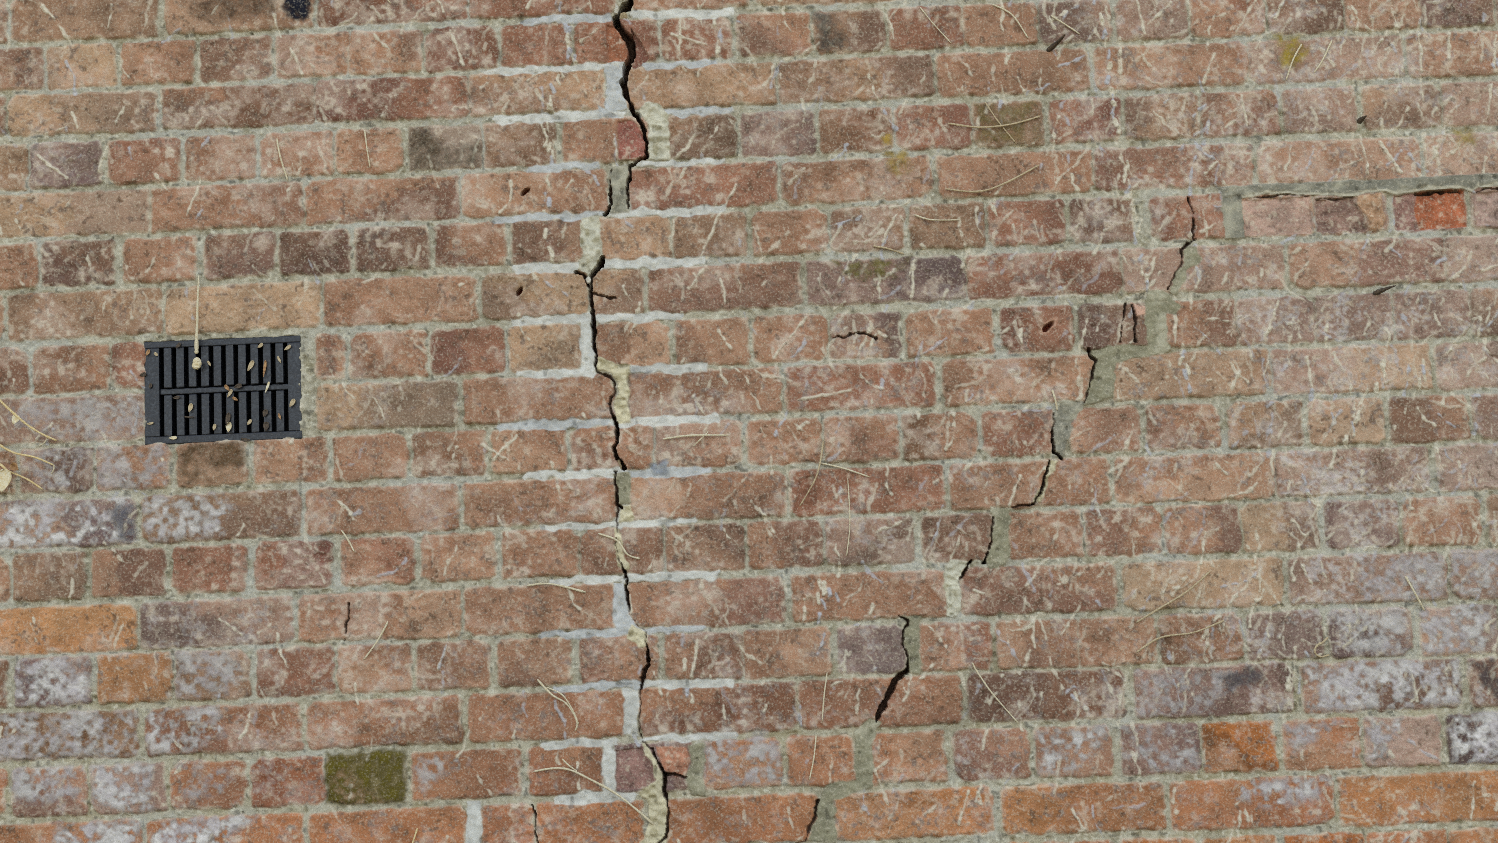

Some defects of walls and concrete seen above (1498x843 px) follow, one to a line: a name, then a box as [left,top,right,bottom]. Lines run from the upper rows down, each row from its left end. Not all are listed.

crack [602,0,649,217]
crack [1167,196,1197,290]
crack [1245,193,1355,202]
crack [1414,187,1498,196]
crack [832,331,878,341]
crack [958,302,1138,581]
crack [573,255,688,843]
crack [875,615,910,723]
crack [795,798,820,843]